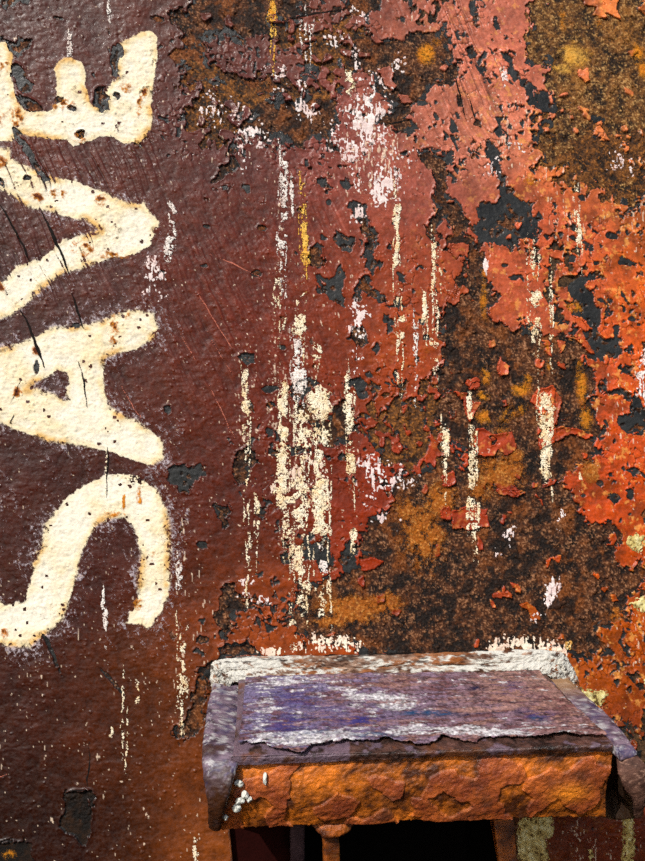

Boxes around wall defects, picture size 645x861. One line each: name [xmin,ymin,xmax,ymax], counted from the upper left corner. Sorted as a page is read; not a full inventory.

rust [553,41,587,73]
rust [633,45,645,75]
peeling [150,0,487,190]
peeling [500,0,645,217]
peeling [212,117,645,659]
rust [503,375,531,420]
rust [577,362,592,428]
rust [393,449,526,568]
rust [309,591,407,628]
peeling [173,664,212,738]
peeling [619,710,645,763]
peeling [0,839,33,861]